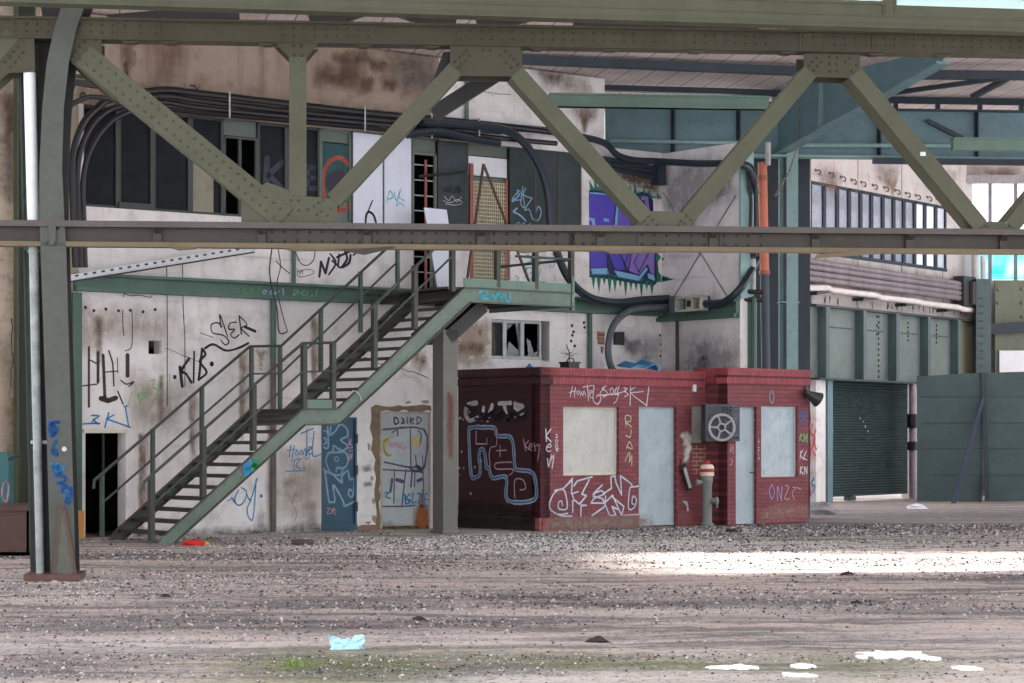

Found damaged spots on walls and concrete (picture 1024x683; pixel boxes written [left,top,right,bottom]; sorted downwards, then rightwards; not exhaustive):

flaking render [357,400,431,530]